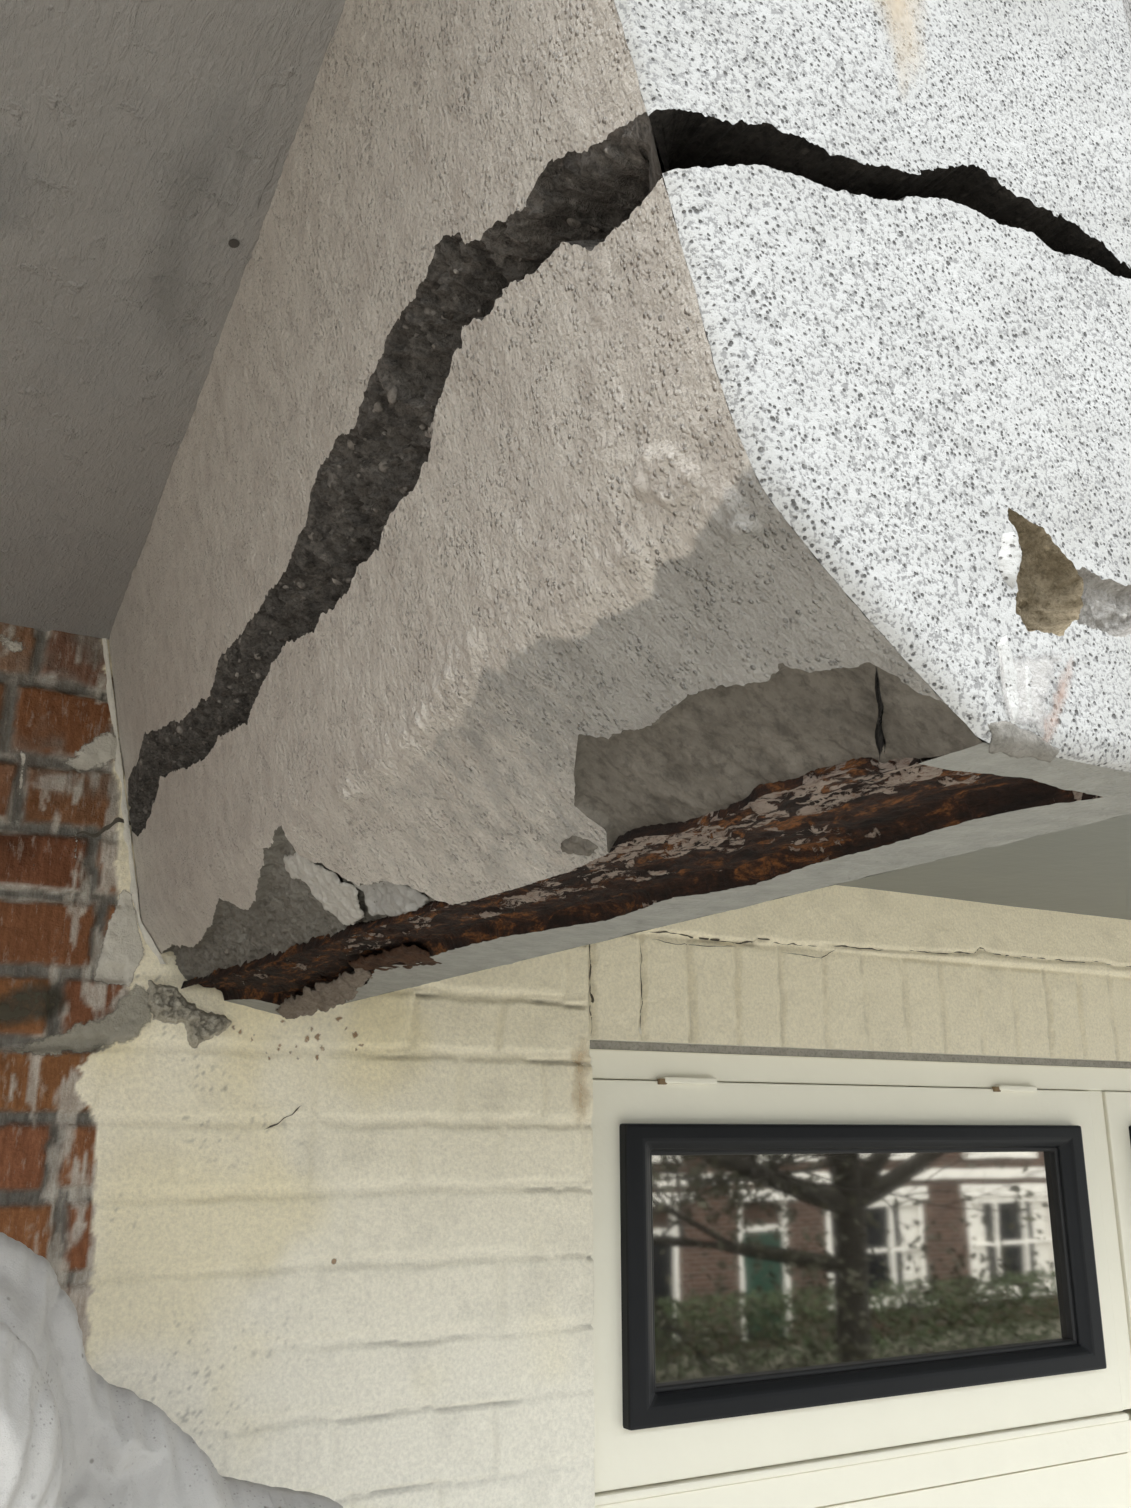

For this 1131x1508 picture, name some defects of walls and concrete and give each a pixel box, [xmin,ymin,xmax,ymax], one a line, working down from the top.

crack [72,109,1131,838]
spalling [998,507,1131,638]
peeling [0,635,23,652]
peeling [65,727,121,773]
spalling [561,635,1060,856]
spalling [94,825,435,1049]
crack [587,944,595,1033]
rust [181,751,1101,1060]
crack [640,931,1131,1030]